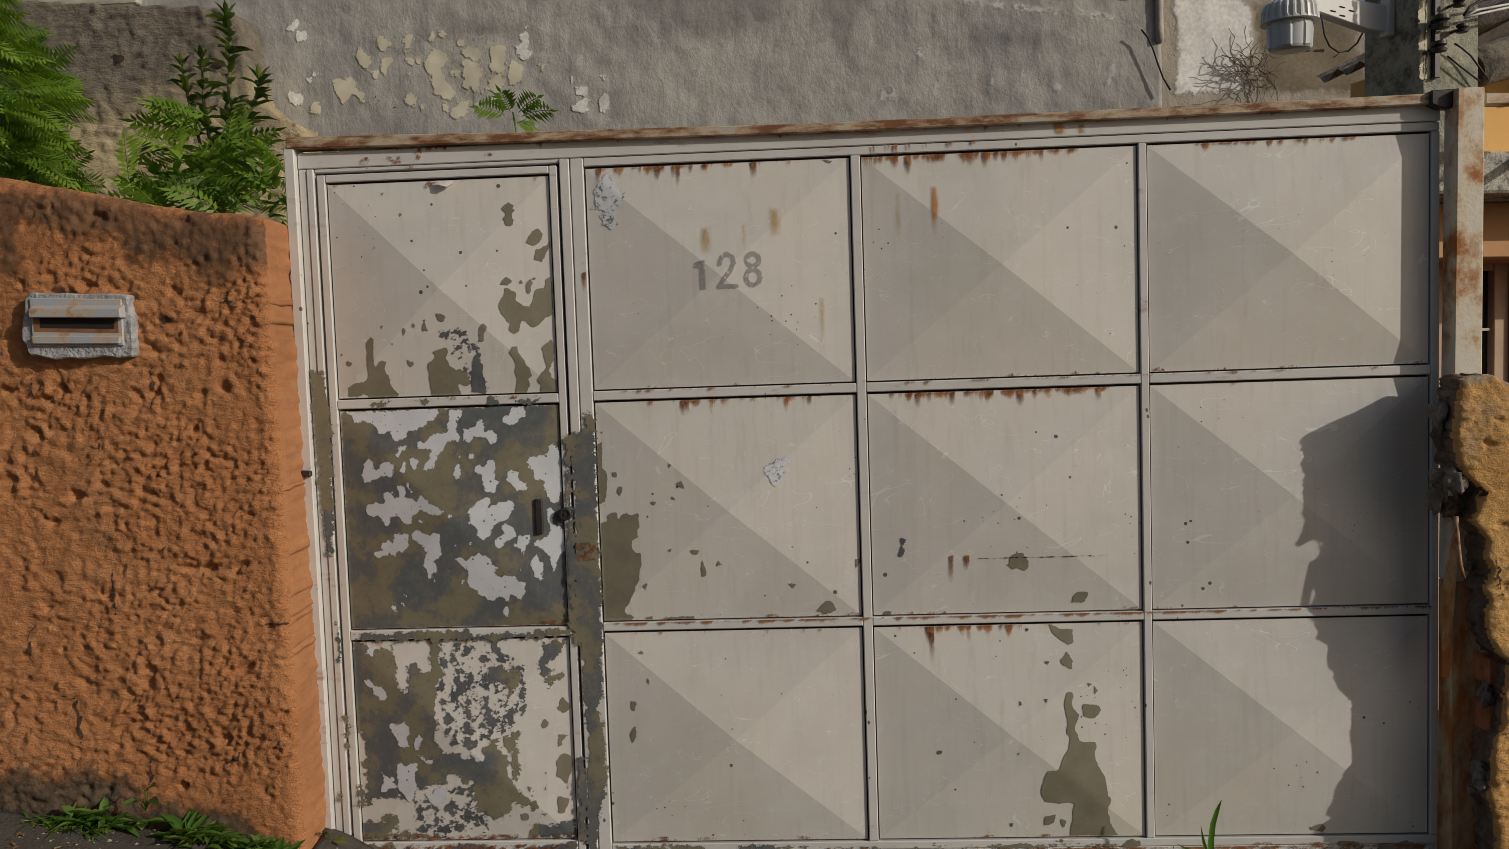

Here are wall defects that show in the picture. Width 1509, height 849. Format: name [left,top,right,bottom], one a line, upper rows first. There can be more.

flaking render [288,25,547,119]
rust [597,162,760,178]
peeling [501,202,515,226]
water stain [0,190,268,285]
crack [1477,487,1489,496]
peeling [309,229,705,849]
rust [610,617,718,634]
peeling [1045,625,1073,669]
rust [742,606,1431,649]
peeling [988,683,1141,849]
water stain [0,766,263,839]
rust [1027,834,1161,849]